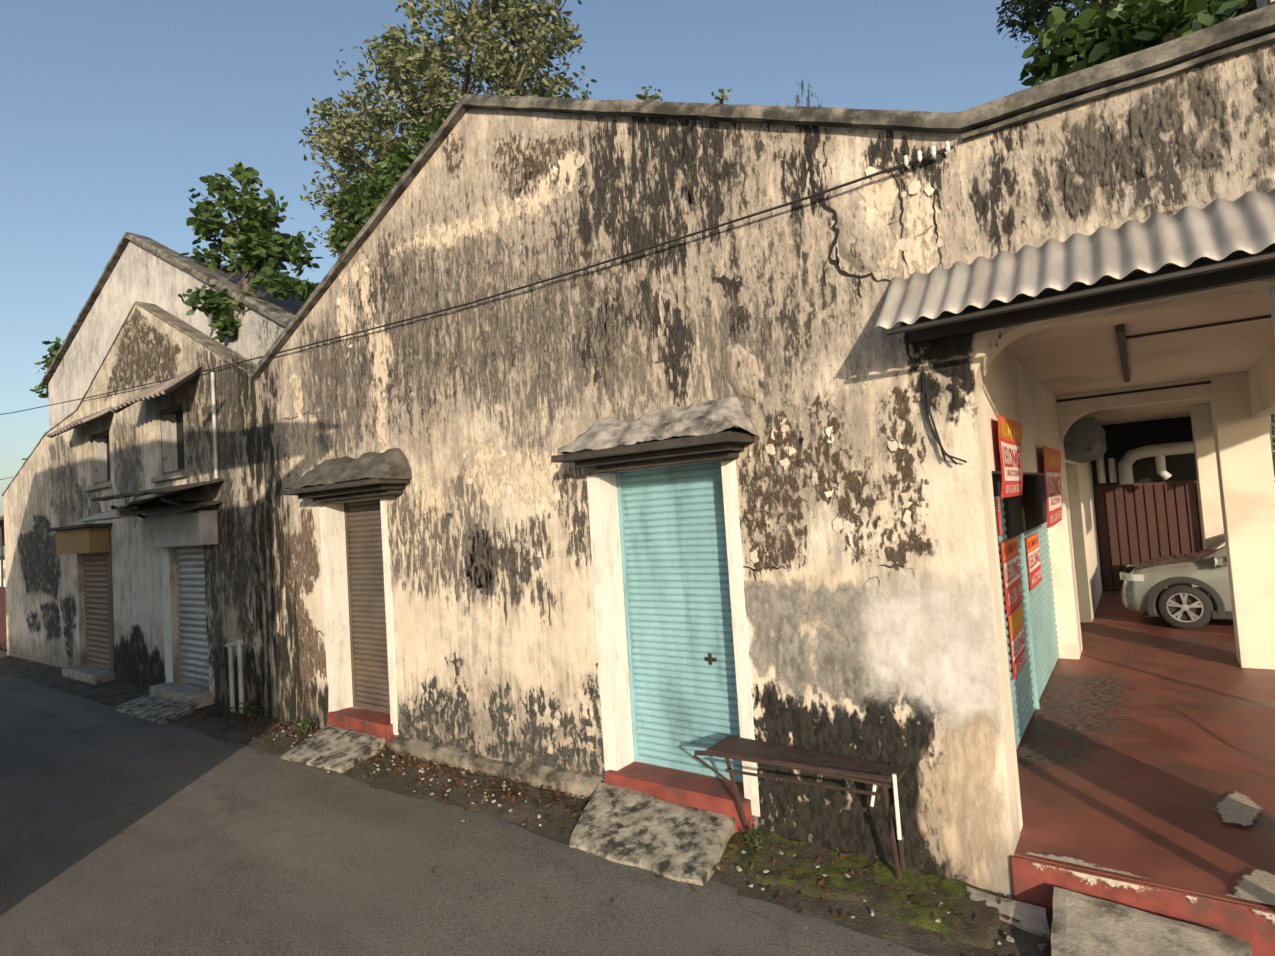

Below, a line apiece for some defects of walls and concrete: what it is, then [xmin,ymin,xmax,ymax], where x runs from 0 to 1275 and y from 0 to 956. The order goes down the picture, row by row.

damp [384,116,787,459]
damp [779,125,837,229]
crack [804,125,942,298]
peeling [852,158,951,279]
damp [864,130,956,209]
damp [970,31,1275,256]
damp [908,341,956,421]
damp [184,344,264,716]
damp [387,466,592,628]
damp [744,580,1001,888]
peeling [1025,852,1159,892]
peeling [1227,869,1275,924]